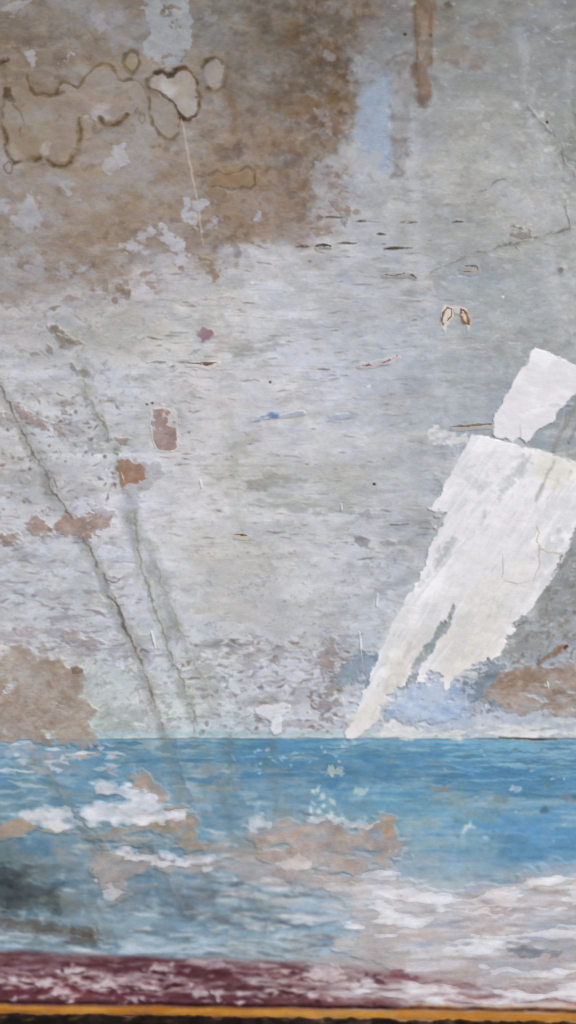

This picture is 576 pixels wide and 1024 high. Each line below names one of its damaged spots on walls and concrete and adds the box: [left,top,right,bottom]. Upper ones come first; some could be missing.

water stain [0,44,230,175]
water stain [204,163,261,209]
peeling [113,401,182,499]
peeling [0,504,126,548]
crack [0,376,221,734]
peeling [352,534,398,548]
peeling [0,627,107,752]
peeling [237,807,576,1006]